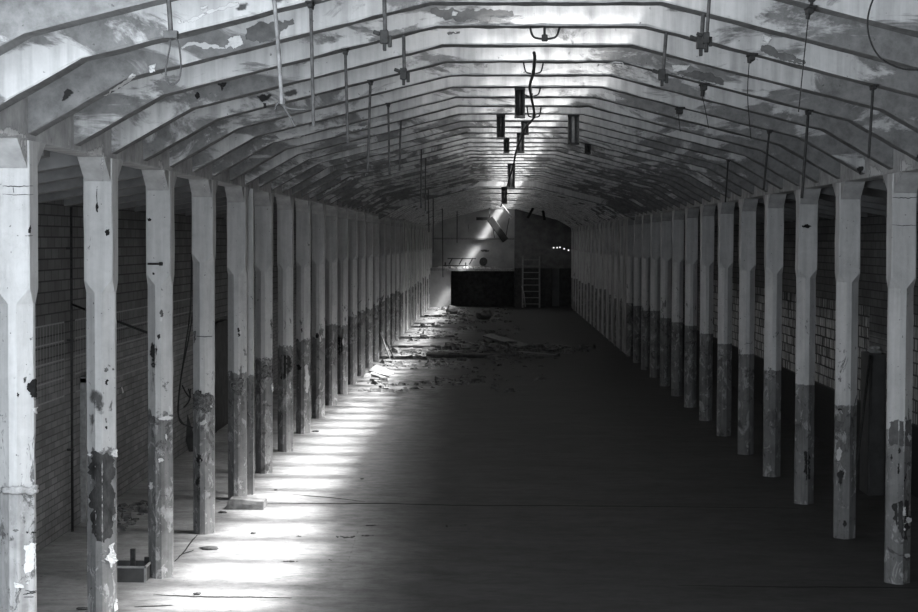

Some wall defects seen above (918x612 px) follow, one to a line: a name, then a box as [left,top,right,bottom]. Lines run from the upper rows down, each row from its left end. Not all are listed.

spalling [193,390,213,425]
peeling [888,419,912,481]
peeling [87,449,118,568]
peeling [892,500,912,540]
peeling [13,529,37,588]